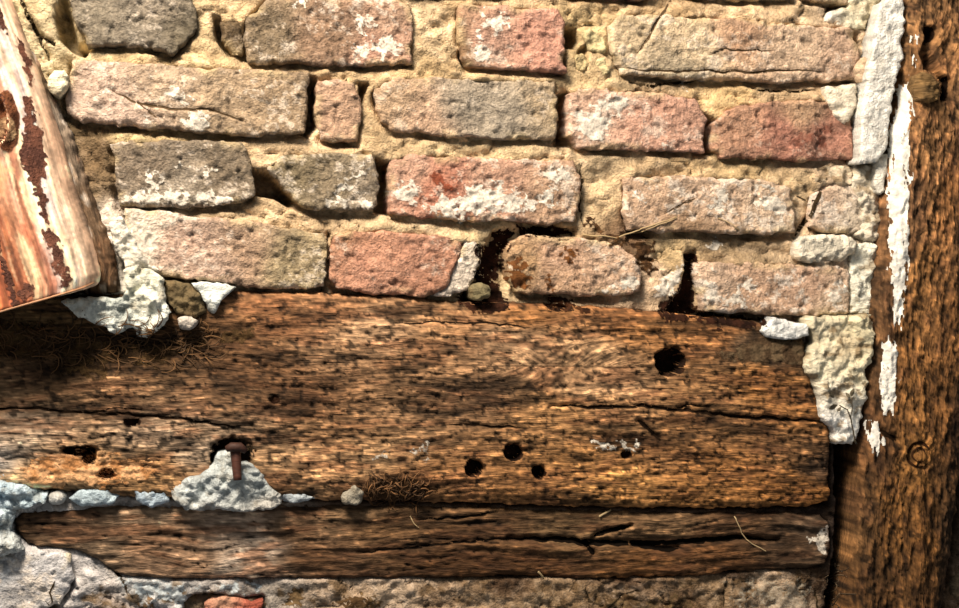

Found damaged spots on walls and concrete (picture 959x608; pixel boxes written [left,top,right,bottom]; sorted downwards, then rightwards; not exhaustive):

crack [20,0,51,56]
water stain [473,7,510,62]
crack [627,0,824,93]
water stain [563,88,628,141]
water stain [388,163,574,314]
corrosion [503,255,533,289]
corrosion [543,273,591,314]
corrosion [559,246,579,264]
peeling [759,0,919,456]
crack [553,403,817,440]
crack [357,512,774,554]